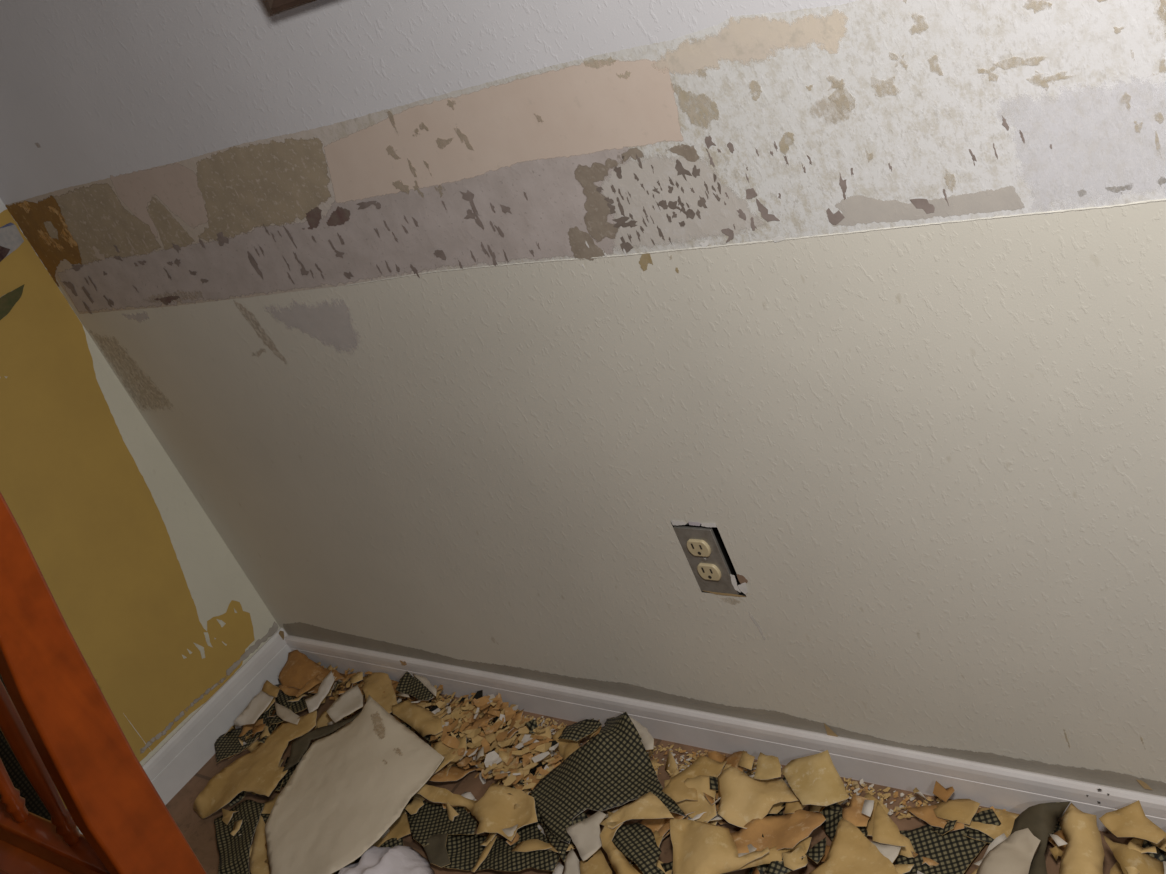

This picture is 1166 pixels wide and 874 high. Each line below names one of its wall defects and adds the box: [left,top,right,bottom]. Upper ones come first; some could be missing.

peeling [8,0,1166,314]